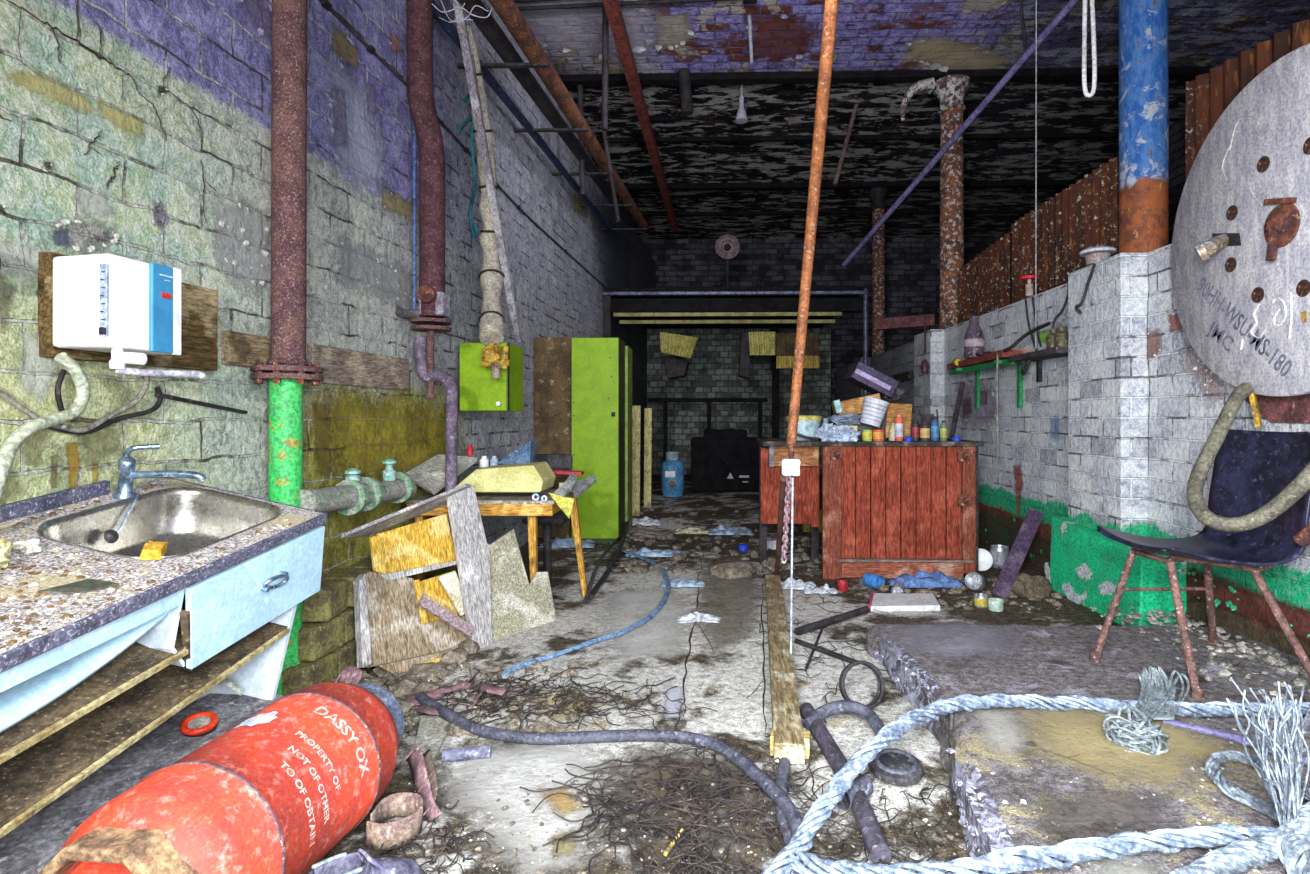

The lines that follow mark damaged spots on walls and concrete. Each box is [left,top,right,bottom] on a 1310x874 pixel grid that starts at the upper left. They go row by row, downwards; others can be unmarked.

peeling [960,0,1008,13]
spalling [745,12,813,62]
peeling [906,37,1004,72]
crack [7,0,228,223]
crack [666,548,714,730]